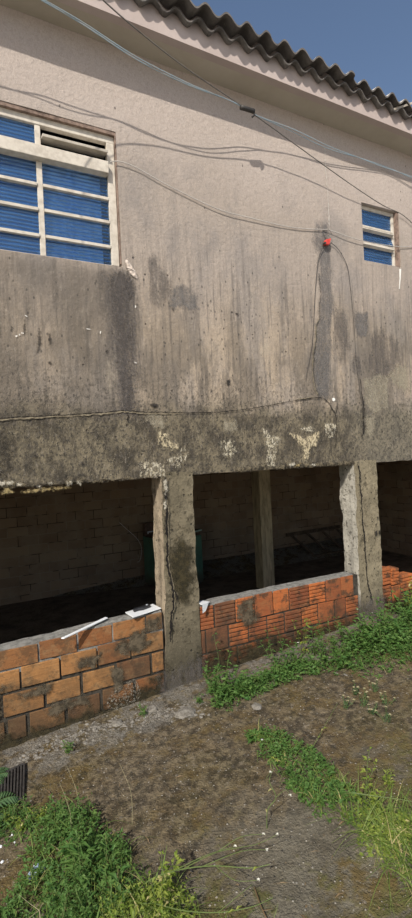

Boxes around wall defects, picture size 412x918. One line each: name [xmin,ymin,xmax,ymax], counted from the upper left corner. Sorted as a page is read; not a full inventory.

crack [0,275,338,437]
water stain [221,422,237,457]
water stain [263,429,280,466]
water stain [291,424,336,460]
water stain [314,225,332,397]
crack [359,380,367,435]
crack [164,476,178,642]
crack [357,462,372,599]